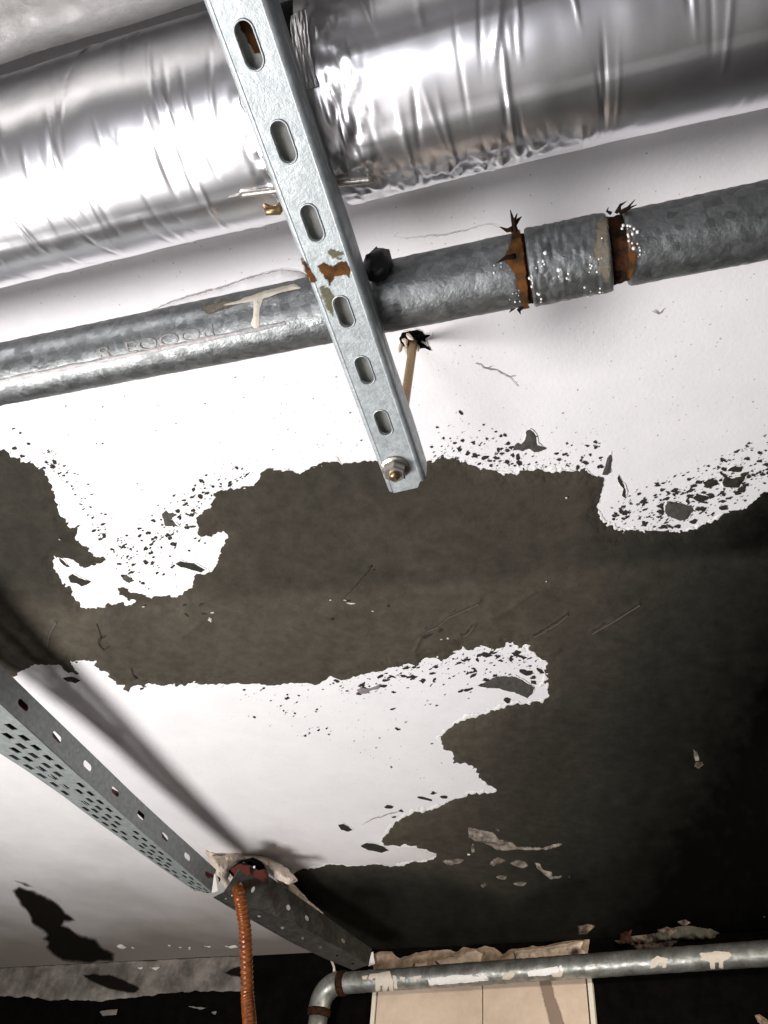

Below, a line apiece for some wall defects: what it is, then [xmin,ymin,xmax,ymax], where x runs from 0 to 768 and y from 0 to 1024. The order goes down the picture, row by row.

flaking render [0,411,768,970]